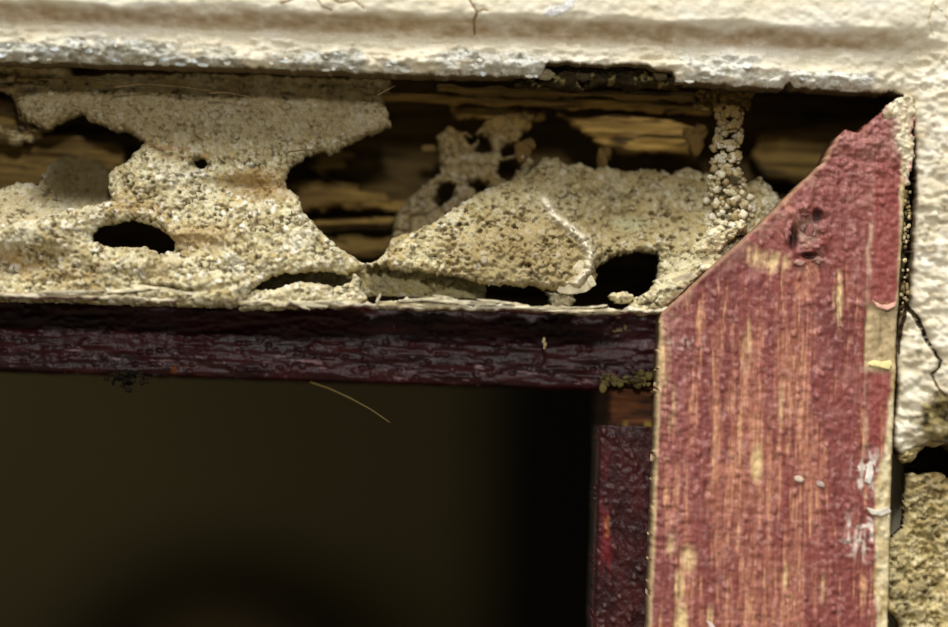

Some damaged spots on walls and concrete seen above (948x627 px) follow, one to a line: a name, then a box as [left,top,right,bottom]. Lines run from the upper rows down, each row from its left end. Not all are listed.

peeling [269,50,364,73]
peeling [385,59,410,73]
crack [897,178,948,399]
spalling [867,441,948,627]